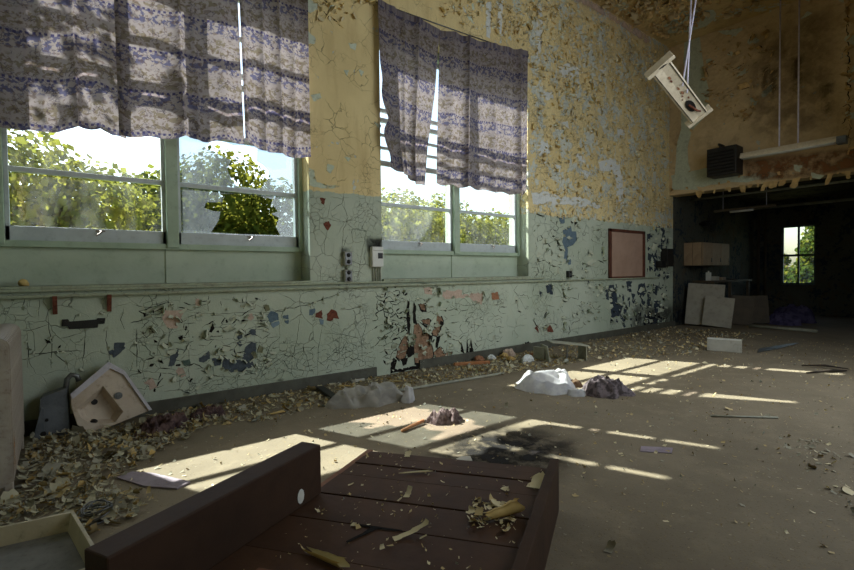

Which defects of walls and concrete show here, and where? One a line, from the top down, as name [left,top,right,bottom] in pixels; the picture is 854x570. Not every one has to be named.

peeling [308,0,378,28]
crack [841,0,854,155]
peeling [109,342,126,358]
peeling [138,297,289,382]
crack [21,196,606,396]
peeling [309,308,339,325]
flaking render [380,283,499,374]